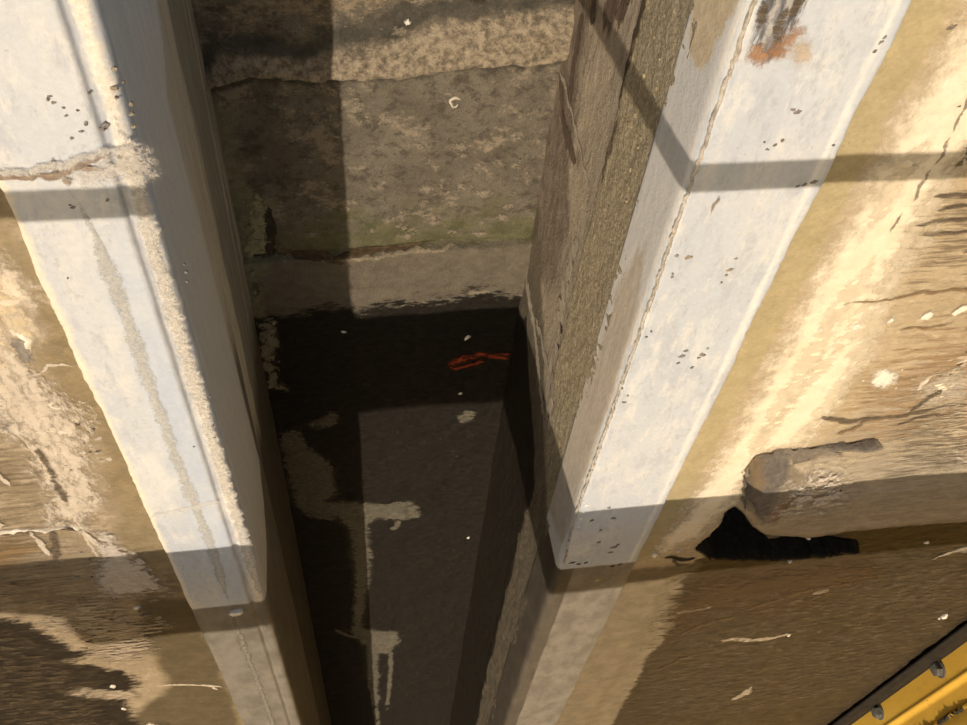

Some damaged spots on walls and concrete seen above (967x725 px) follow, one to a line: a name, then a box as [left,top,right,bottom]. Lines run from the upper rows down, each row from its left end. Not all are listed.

rust [748,0,810,65]
leakage [0,256,45,388]
leakage [655,12,967,555]
crack [844,288,967,305]
crack [904,323,946,331]
crack [0,524,108,561]
leakage [277,429,422,725]
spalling [696,438,883,564]